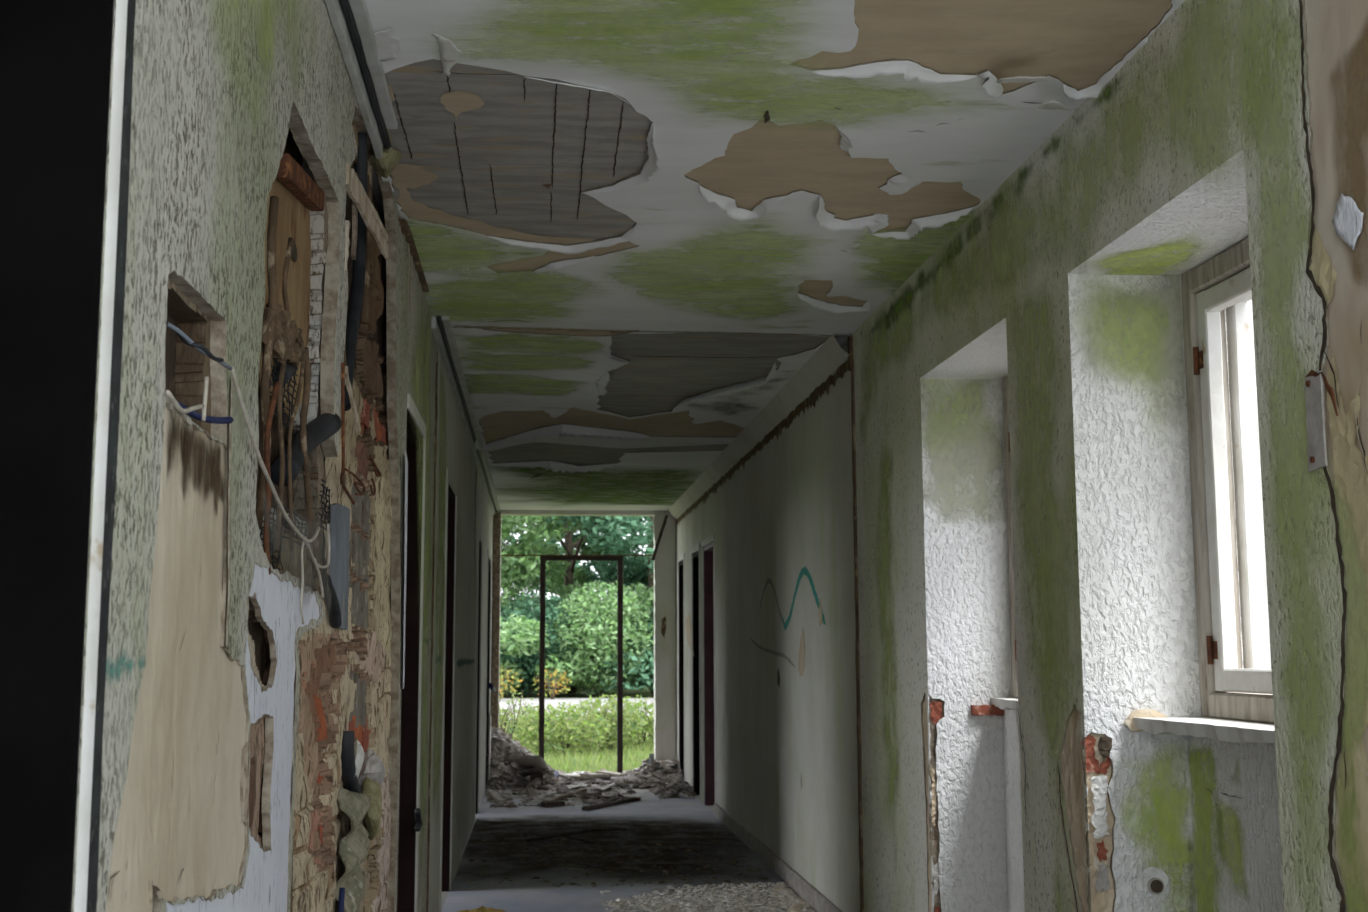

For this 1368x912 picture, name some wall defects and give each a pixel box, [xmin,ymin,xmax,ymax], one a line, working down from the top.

spalling [283,128,317,184]
peeling [374,27,660,273]
peeling [685,117,980,240]
peeling [793,0,1172,110]
crack [1299,0,1368,475]
leakage [168,413,224,513]
peeling [106,199,328,912]
peeling [461,325,829,479]
spalling [923,695,944,912]
flaking render [971,705,1023,760]
spalling [1062,708,1114,912]
crack [1323,466,1347,912]